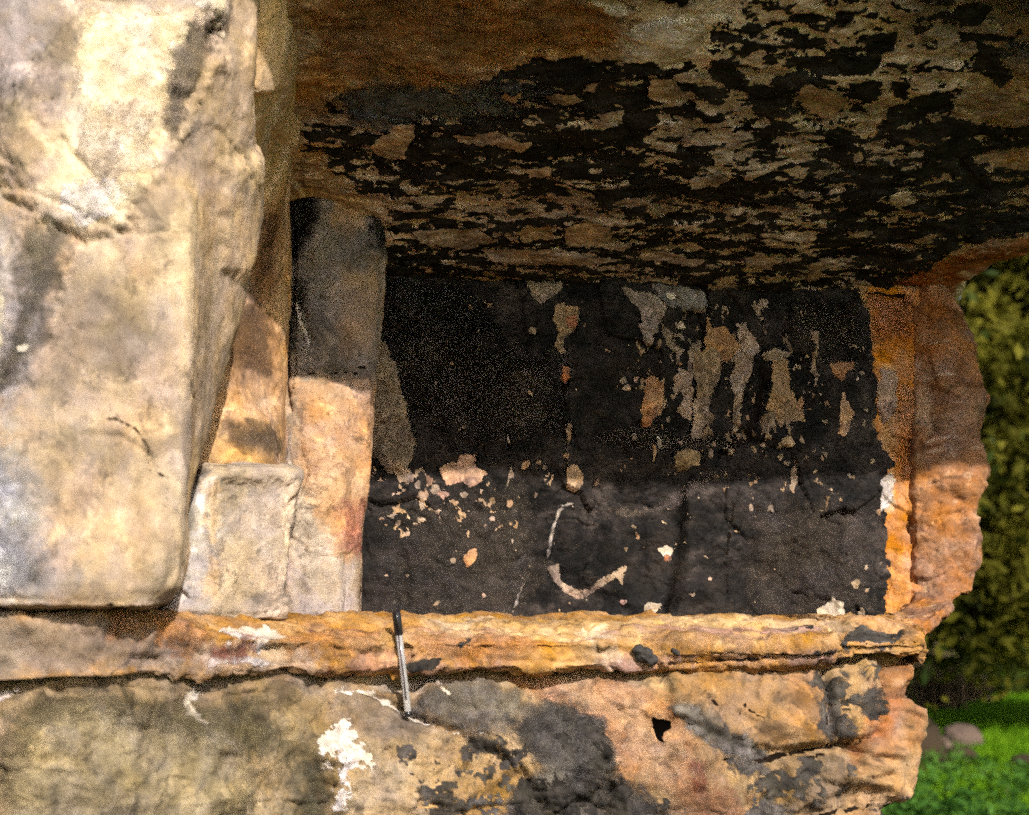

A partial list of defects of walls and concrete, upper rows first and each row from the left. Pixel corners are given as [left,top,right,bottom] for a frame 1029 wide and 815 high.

peeling [590,0,736,105]
peeling [370,124,415,160]
peeling [413,222,708,267]
peeling [525,280,586,390]
peeling [615,282,899,515]
peeling [371,340,520,567]
peeling [508,422,599,492]
peeling [544,561,627,612]
peeling [658,542,686,561]
peeling [817,597,845,616]
damp [335,687,429,725]
damp [304,718,376,815]